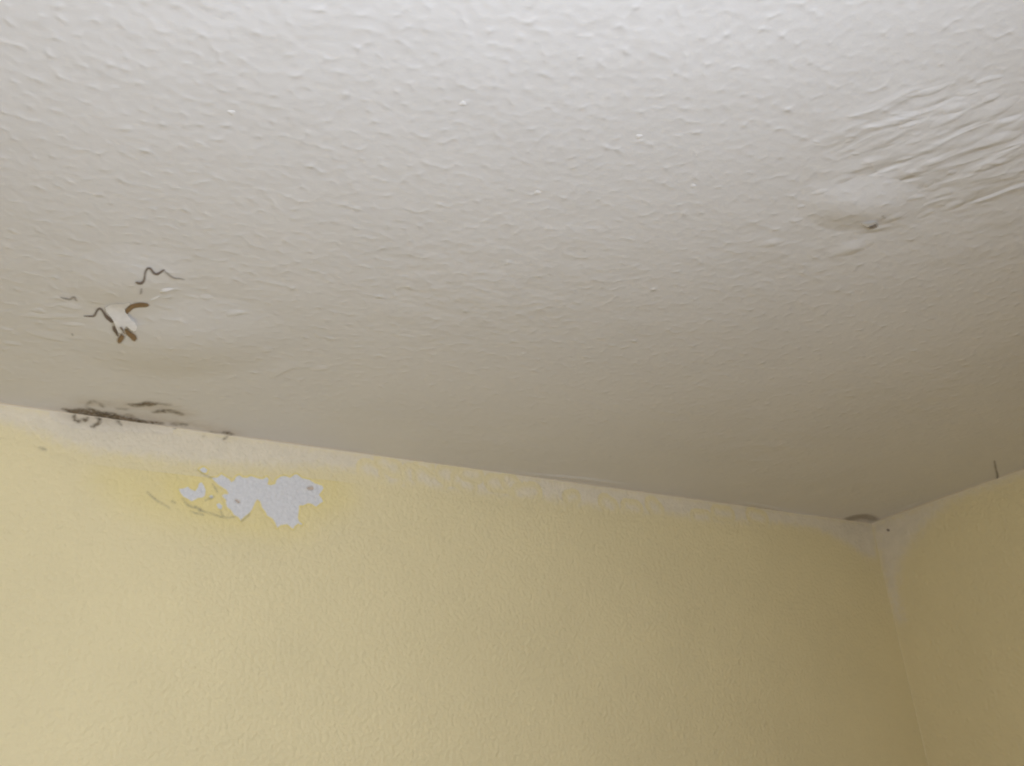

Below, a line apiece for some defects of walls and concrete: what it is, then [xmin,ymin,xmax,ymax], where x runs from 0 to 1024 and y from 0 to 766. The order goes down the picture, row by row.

peeling [63,244,199,343]
crack [136,267,174,301]
damp [34,392,257,438]
peeling [177,472,325,530]